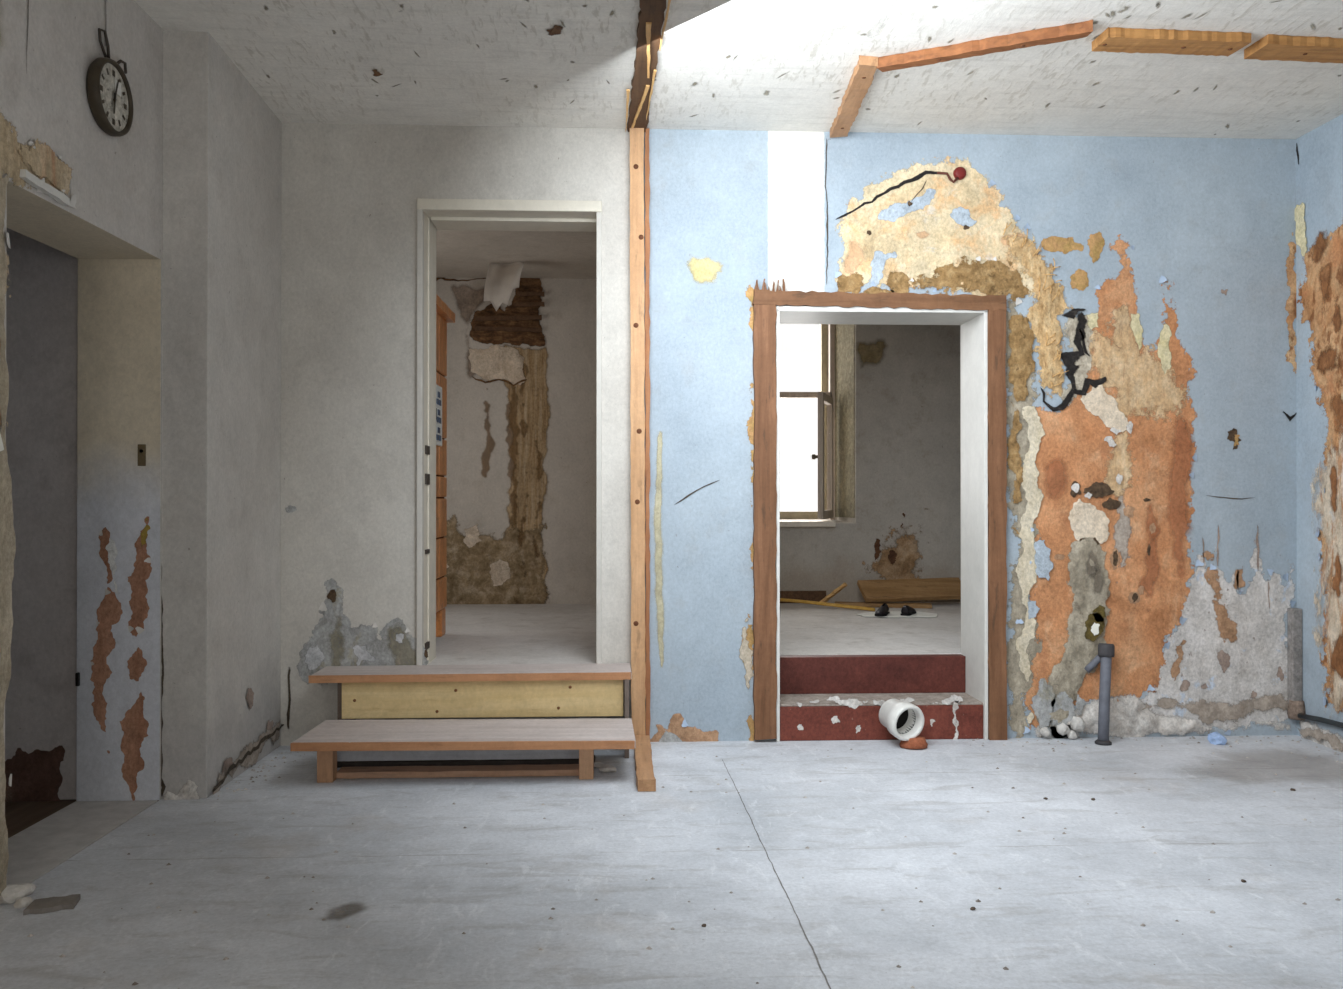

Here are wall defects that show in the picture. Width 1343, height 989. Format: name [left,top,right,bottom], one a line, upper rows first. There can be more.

crack [825,138,937,284]
flaking render [469,278,545,347]
crack [1040,308,1107,411]
flaking render [0,107,77,896]
peeling [835,156,1343,753]
peeling [90,516,152,801]
peeling [297,578,429,689]
peeling [650,713,719,742]